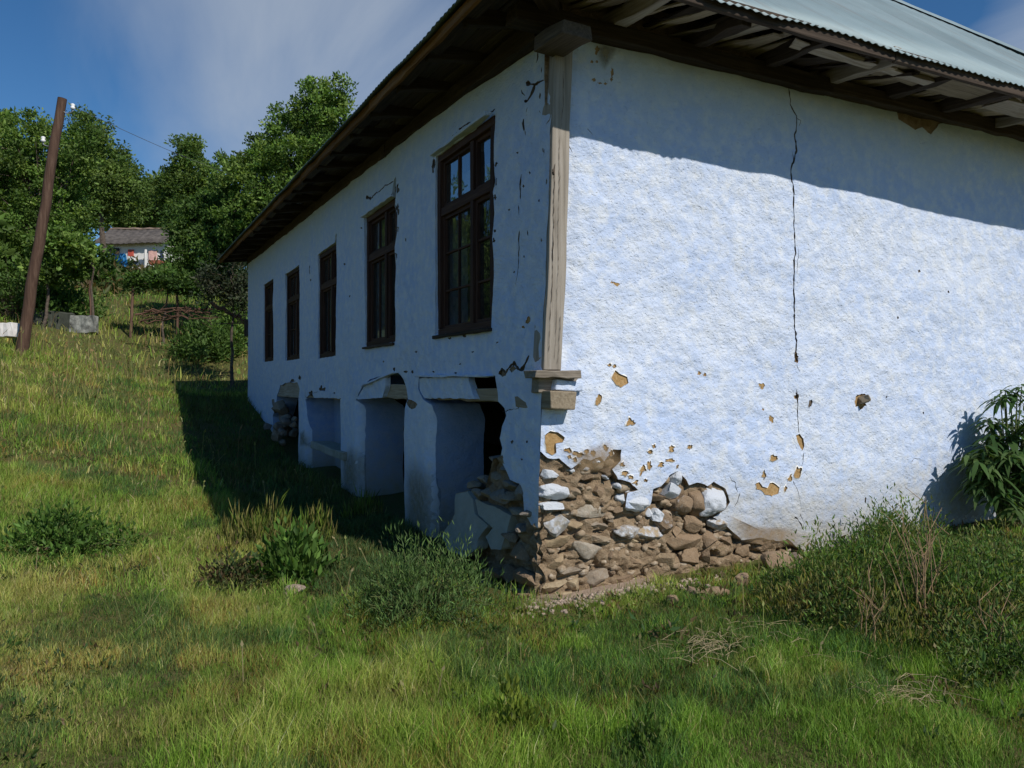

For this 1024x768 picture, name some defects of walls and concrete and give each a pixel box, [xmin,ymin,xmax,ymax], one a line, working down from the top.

crack [521,53,572,151]
spalling [897,113,941,134]
crack [516,174,528,280]
crack [789,90,804,529]
crack [499,356,529,374]
peeling [606,363,628,387]
spalling [441,431,803,598]